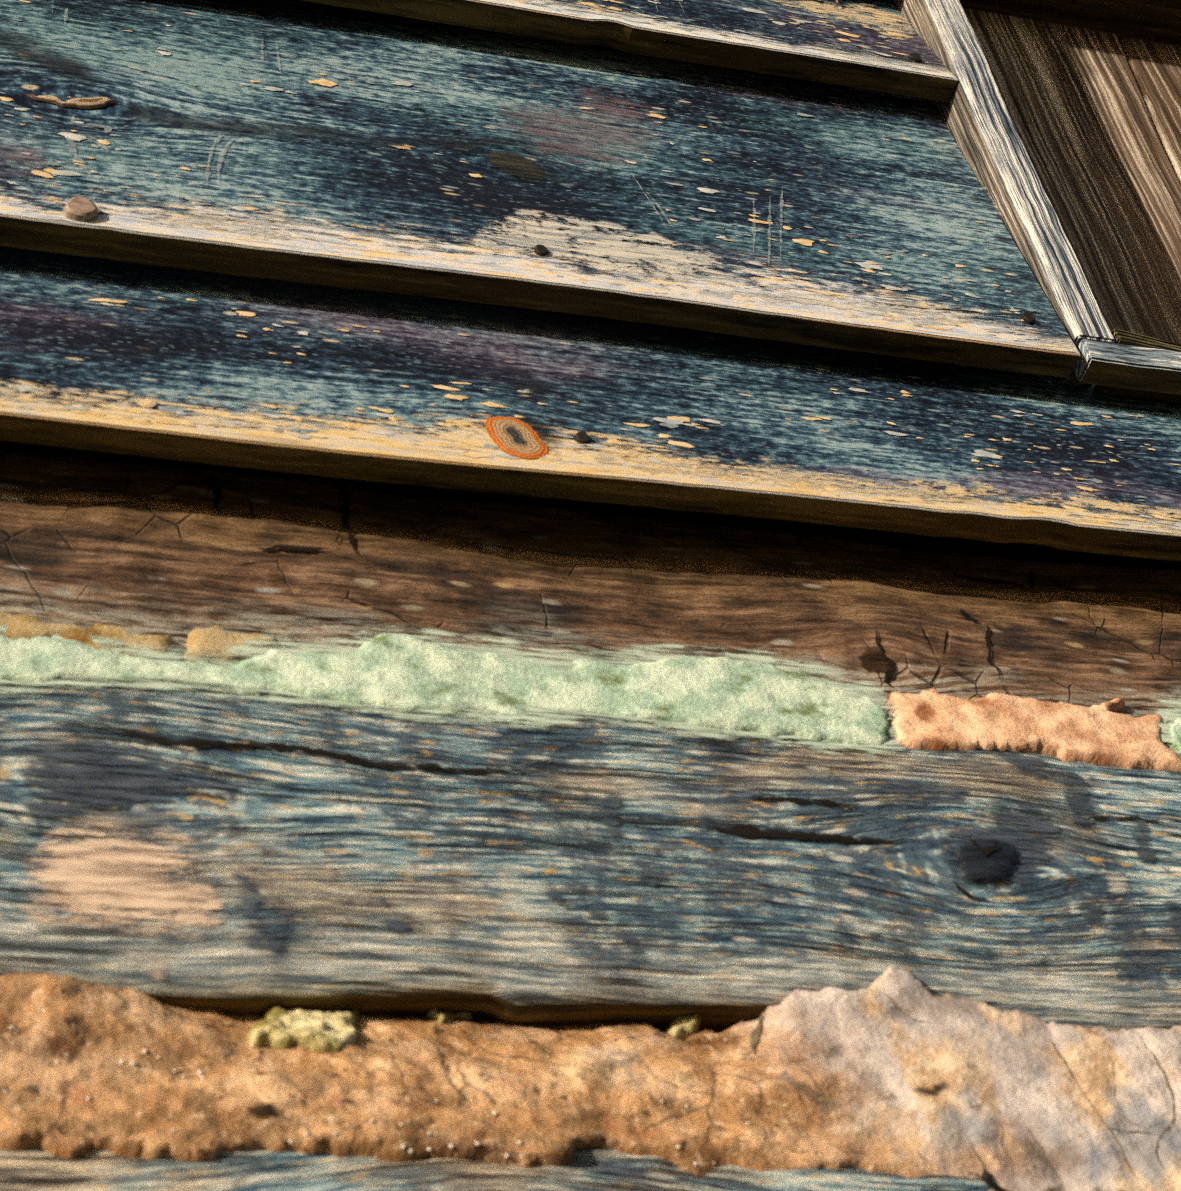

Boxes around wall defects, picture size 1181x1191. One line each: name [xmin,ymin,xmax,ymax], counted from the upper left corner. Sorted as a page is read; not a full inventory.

peeling [239,80,297,94]
peeling [308,73,338,87]
peeling [0,121,1074,352]
peeling [0,379,1181,534]
crack [257,480,373,569]
crack [750,1012,763,1055]
crack [883,992,931,1023]
crack [1049,1031,1176,1175]
crack [969,1127,1065,1191]